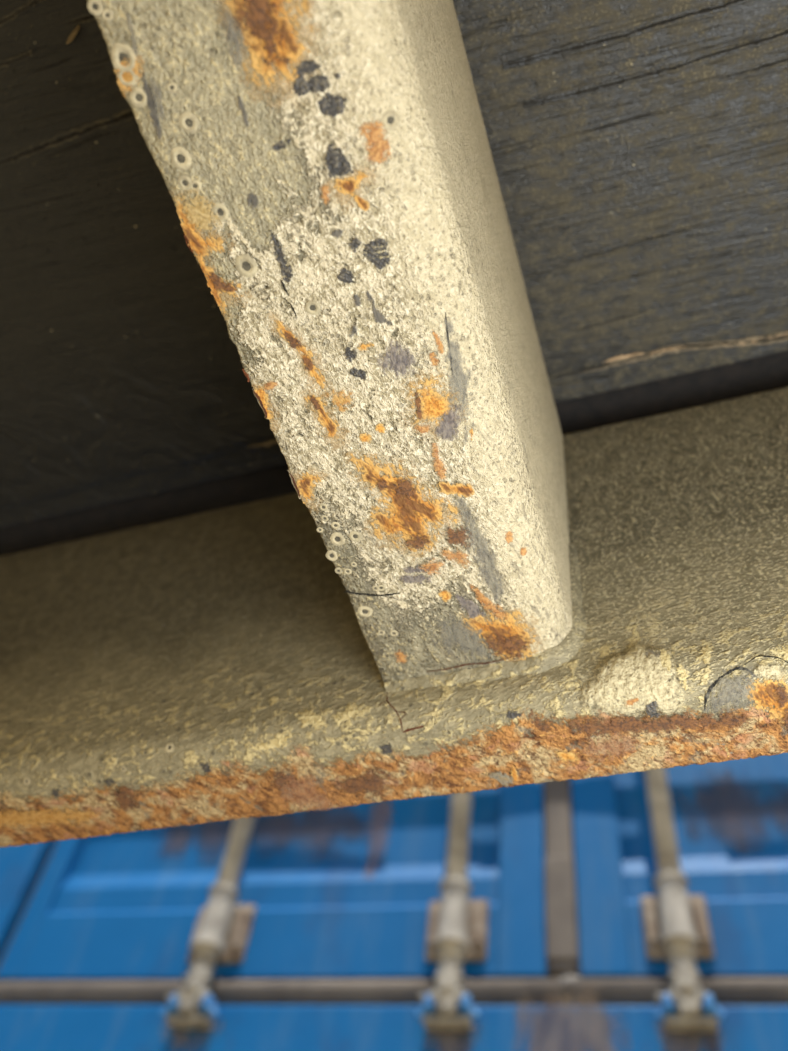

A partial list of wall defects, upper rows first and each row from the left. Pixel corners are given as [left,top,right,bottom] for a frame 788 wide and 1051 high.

corrosion [225,0,313,91]
corrosion [176,191,242,313]
corrosion [350,332,474,575]
corrosion [464,586,536,662]
crack [379,692,423,733]
crack [704,655,788,709]
corrosion [0,677,788,850]